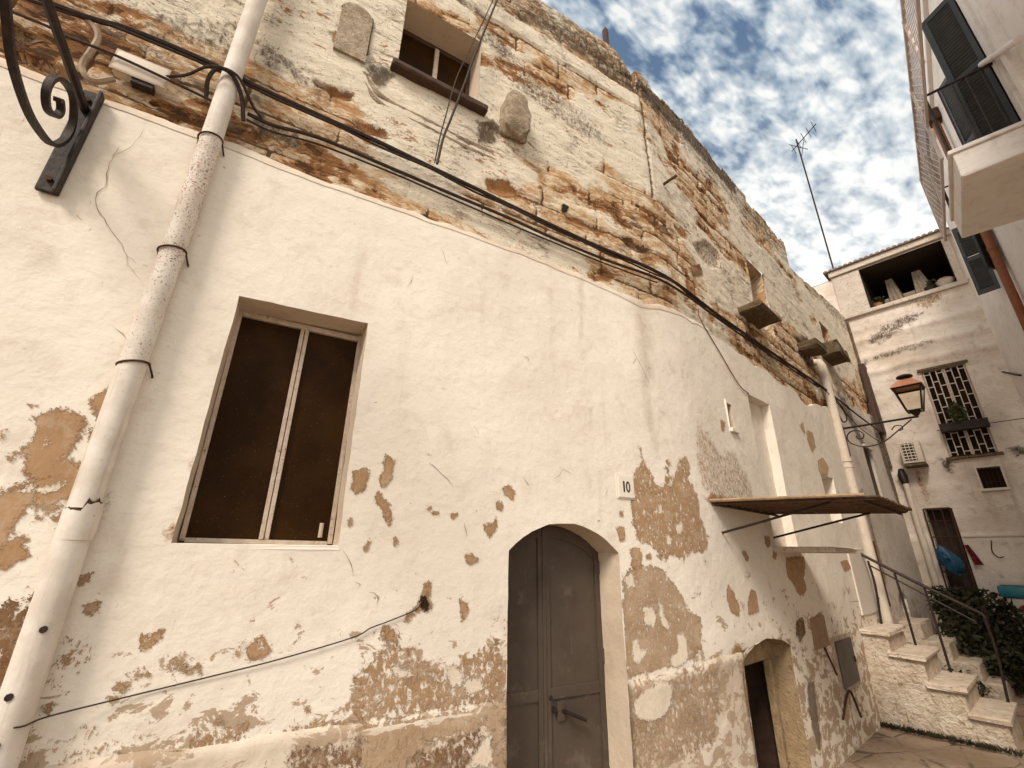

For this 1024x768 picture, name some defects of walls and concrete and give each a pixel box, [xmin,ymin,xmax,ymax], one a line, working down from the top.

crack [95,131,143,273]
spalling [561,204,650,255]
peeling [0,385,109,571]
peeling [351,453,399,546]
peeling [483,484,515,538]
peeling [765,536,806,596]
peeling [616,430,752,768]
peeling [138,628,165,652]
peeling [105,651,202,706]
peeling [232,634,273,660]
peeling [267,580,506,768]
peeling [165,715,250,752]